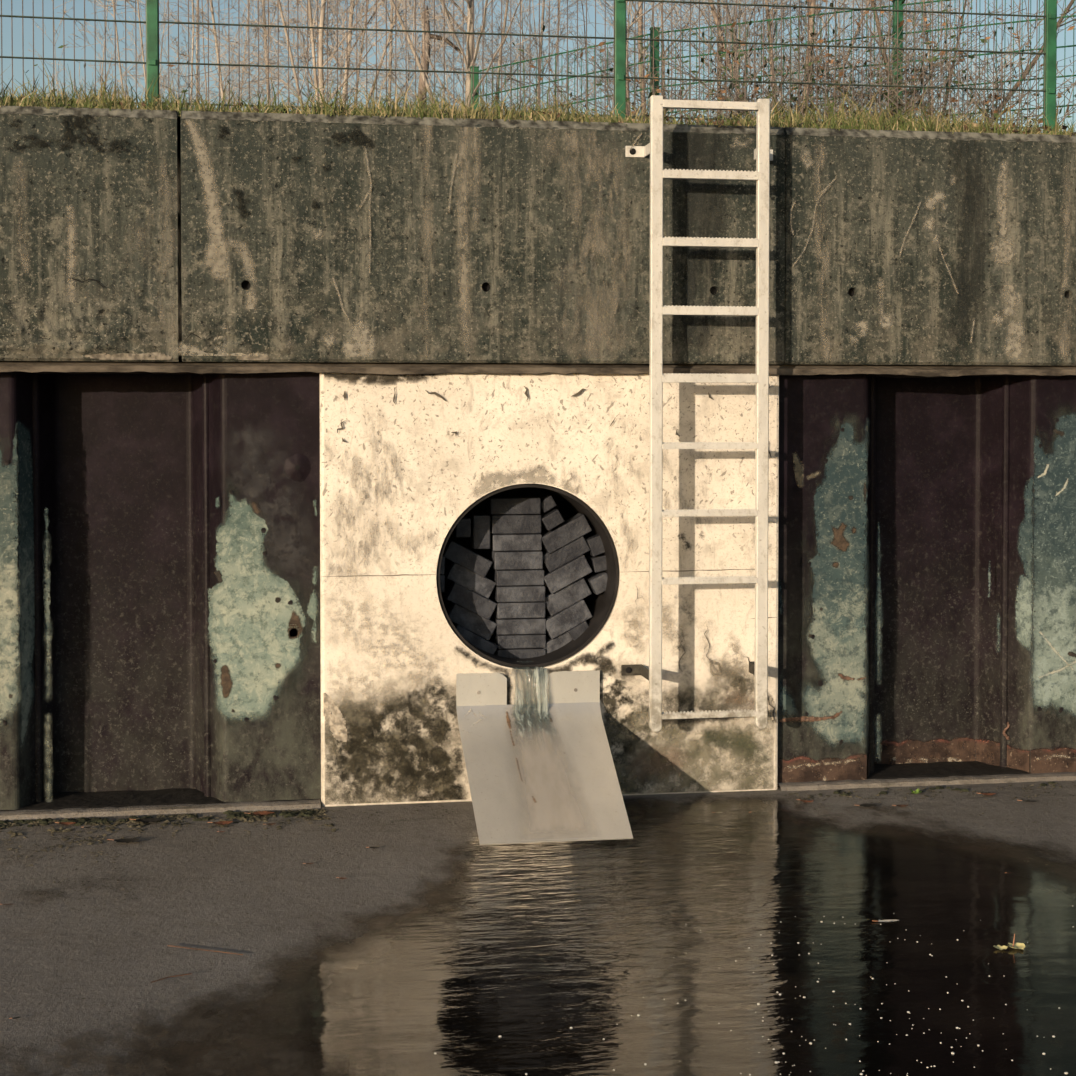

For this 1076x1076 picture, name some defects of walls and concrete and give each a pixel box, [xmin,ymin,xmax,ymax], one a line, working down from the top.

leakage [178,327,260,356]
leakage [186,119,256,310]
leakage [458,127,479,342]
leakage [671,133,738,345]
peeling [0,421,51,747]
peeling [208,483,317,722]
leakage [325,607,462,804]
leakage [595,663,651,763]
peeling [768,420,882,759]
corrosion [777,722,1076,787]
peeling [1015,407,1076,716]
leakage [53,775,1076,1076]